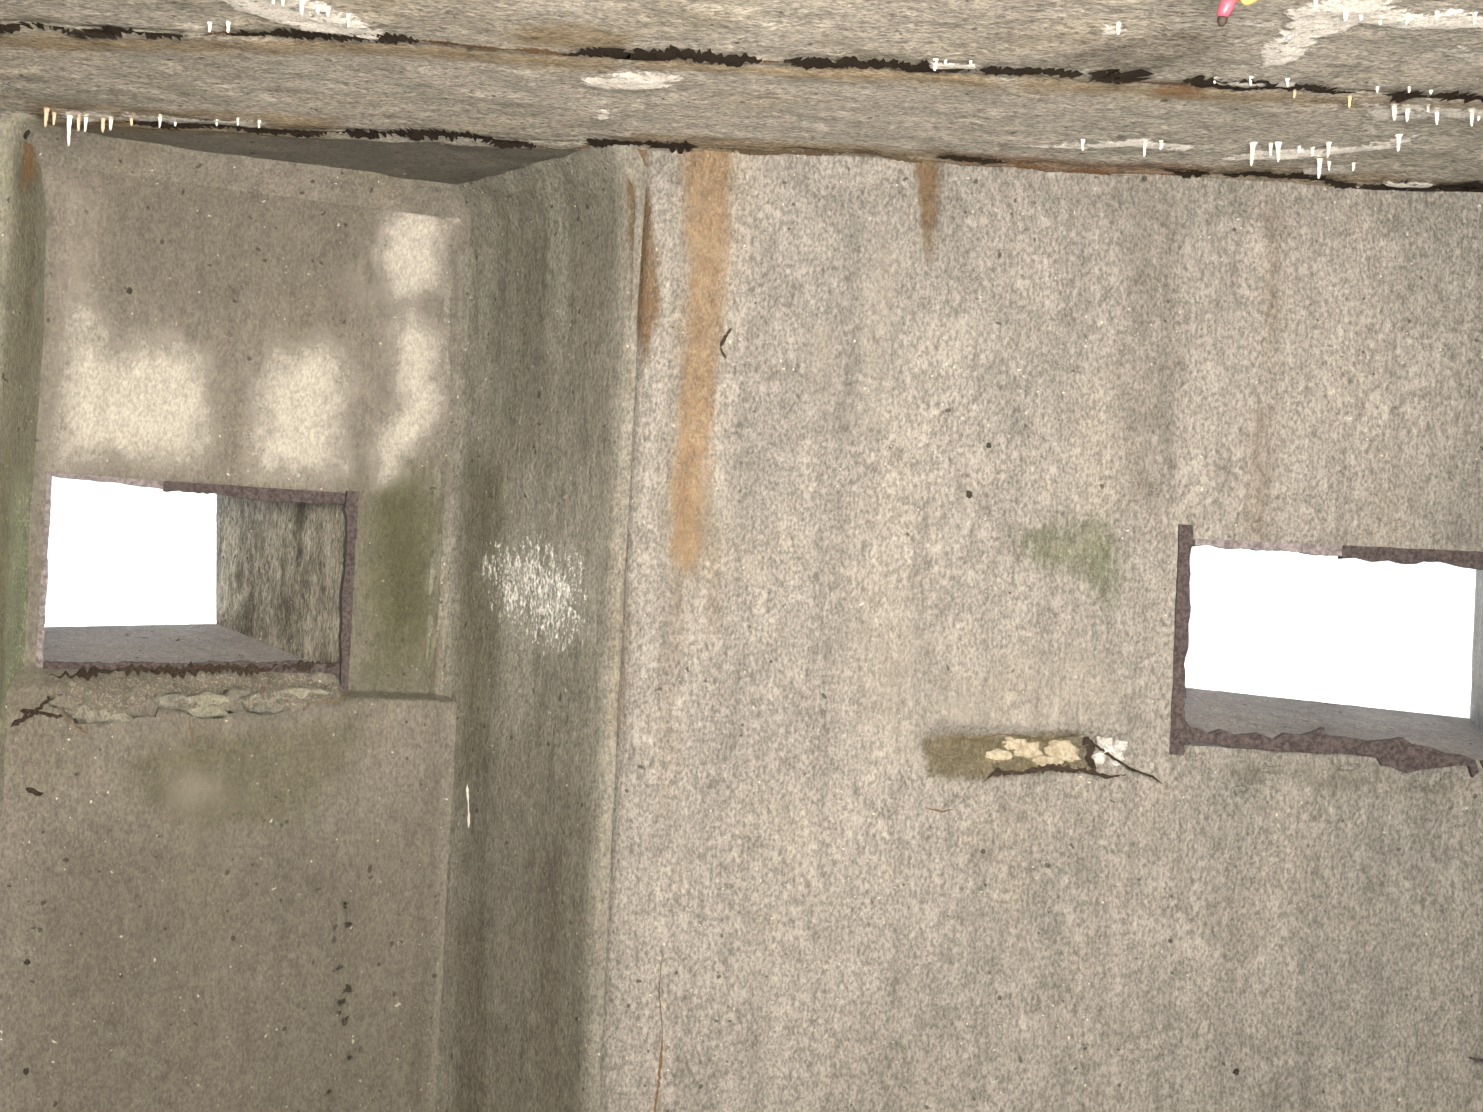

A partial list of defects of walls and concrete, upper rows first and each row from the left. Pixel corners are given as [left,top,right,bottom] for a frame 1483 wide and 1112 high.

efflorescence [207,0,388,40]
efflorescence [1213,0,1483,98]
efflorescence [43,107,265,146]
corrosion [916,159,938,246]
efflorescence [1016,138,1194,157]
efflorescence [1220,86,1483,179]
efflorescence [1383,180,1433,188]
water stain [54,306,211,463]
water stain [250,343,349,476]
water stain [377,212,445,484]
efflorescence [479,530,589,654]
spalling [926,733,1162,784]